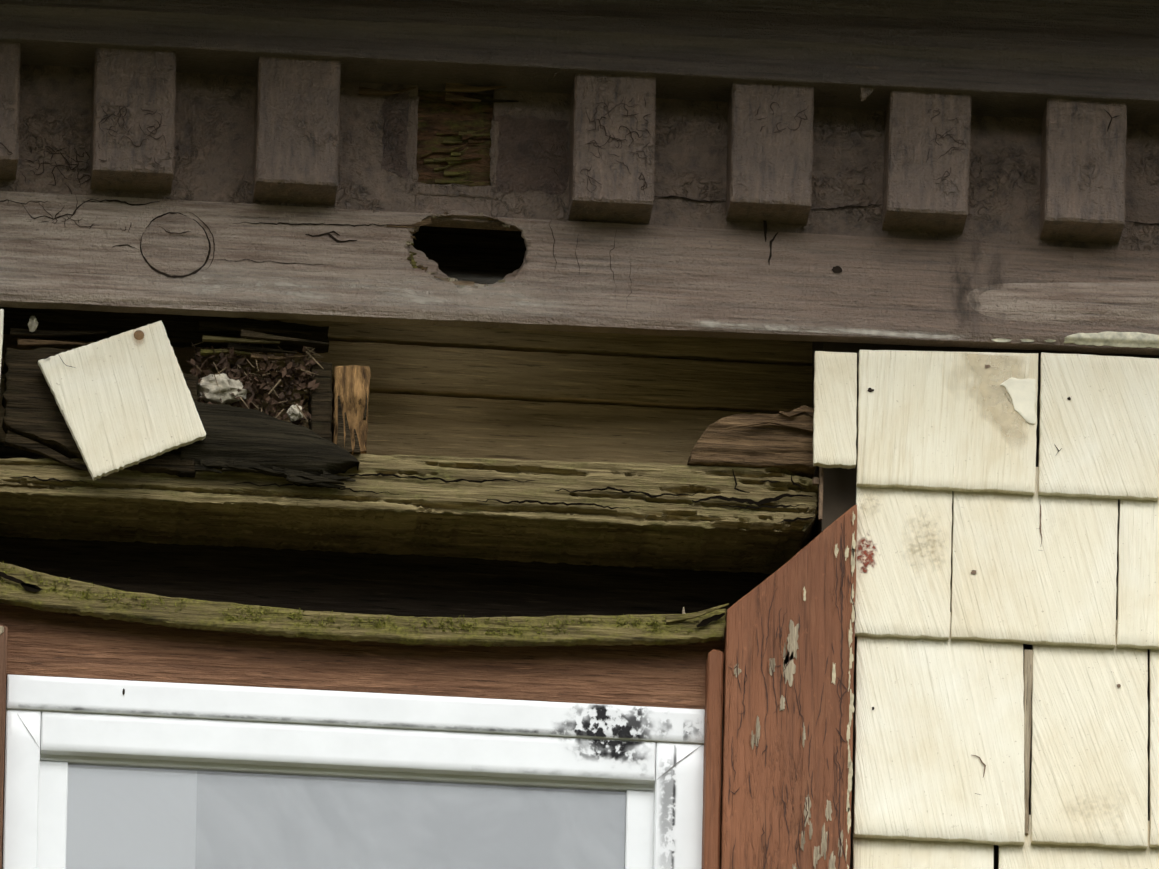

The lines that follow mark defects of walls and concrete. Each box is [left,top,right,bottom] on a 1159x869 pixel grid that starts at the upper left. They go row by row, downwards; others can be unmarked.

crack [580,96,726,202]
crack [755,102,808,133]
crack [926,109,966,180]
crack [0,106,400,278]
crack [810,203,875,211]
peeling [768,620,799,711]
peeling [799,512,856,869]
water stain [552,705,648,760]
peeling [749,716,760,750]